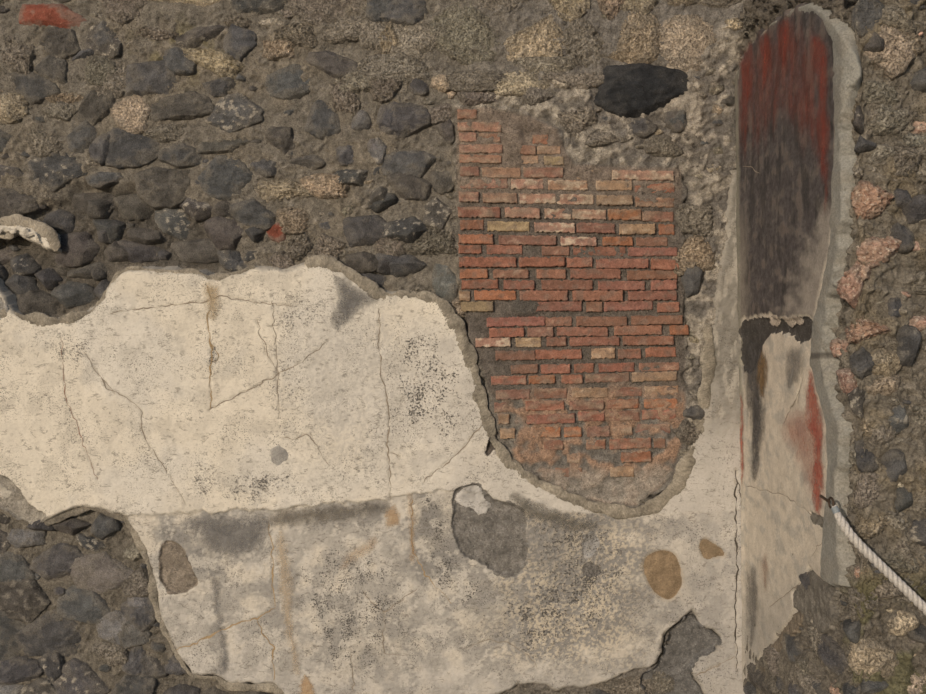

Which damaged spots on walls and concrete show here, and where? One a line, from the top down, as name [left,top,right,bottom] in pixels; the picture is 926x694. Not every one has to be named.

spalling [0,225,41,244]
spalling [0,475,47,525]
crack [61,342,98,478]
crack [85,353,184,500]
spalling [158,541,197,595]
crack [110,286,329,465]
crack [361,309,483,656]
crack [696,470,812,676]
damp [746,342,764,478]
spalling [738,315,813,372]
spalling [640,614,722,694]